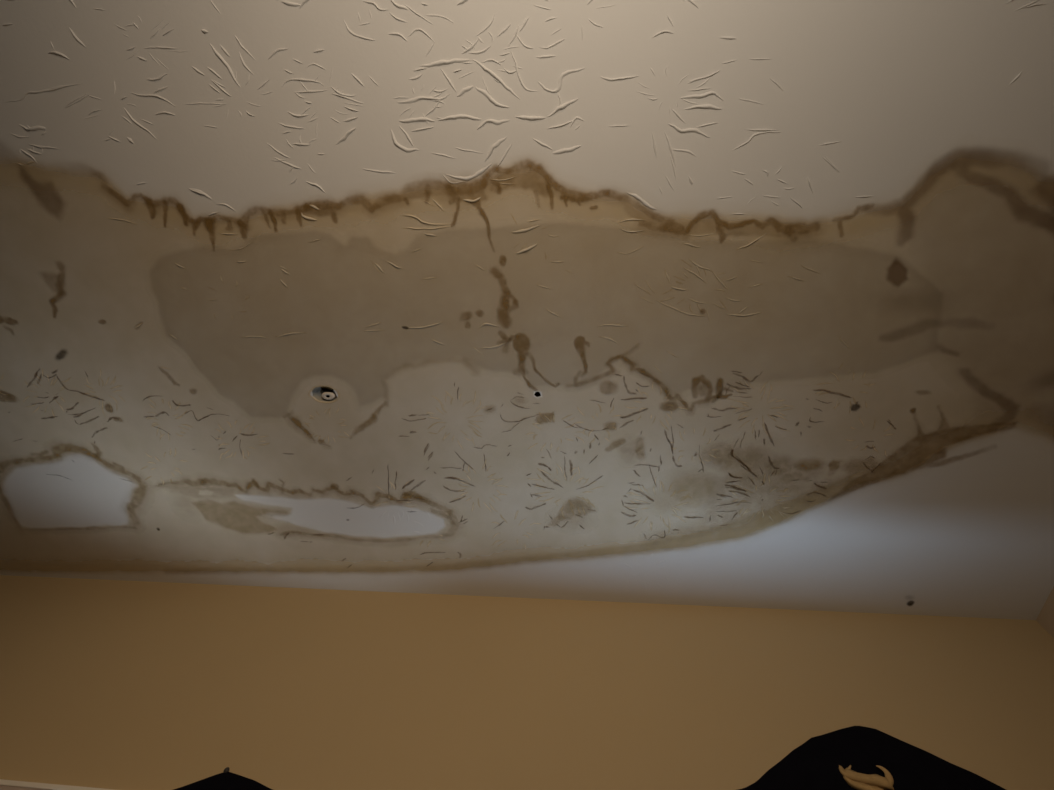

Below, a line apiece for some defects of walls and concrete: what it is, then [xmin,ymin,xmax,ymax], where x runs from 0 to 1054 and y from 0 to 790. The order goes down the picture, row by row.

damp [89,180,246,244]
damp [264,166,513,235]
damp [522,162,897,244]
damp [499,289,541,388]
crack [35,371,111,443]
damp [607,356,692,410]
damp [15,446,144,509]
crack [446,404,534,521]
crack [526,373,648,527]
crack [623,434,703,524]
crack [664,372,851,533]
damp [418,550,556,570]